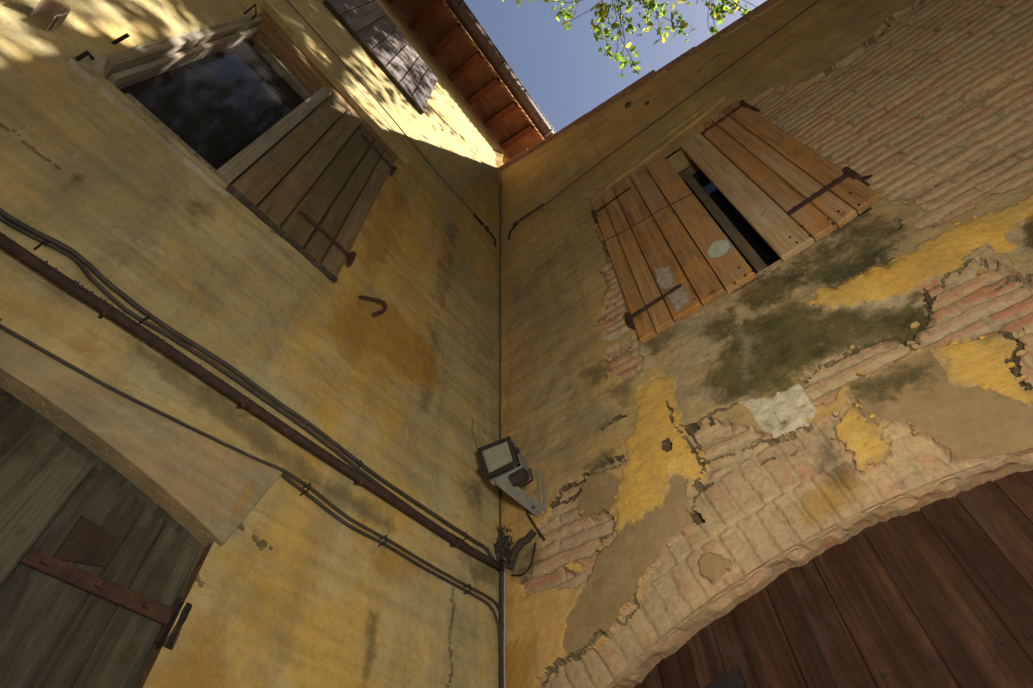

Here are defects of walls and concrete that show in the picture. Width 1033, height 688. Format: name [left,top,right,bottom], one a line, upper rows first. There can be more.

water stain [1024,217,1033,248]
spalling [517,0,1033,688]
water stain [738,383,817,439]
crack [447,587,456,688]